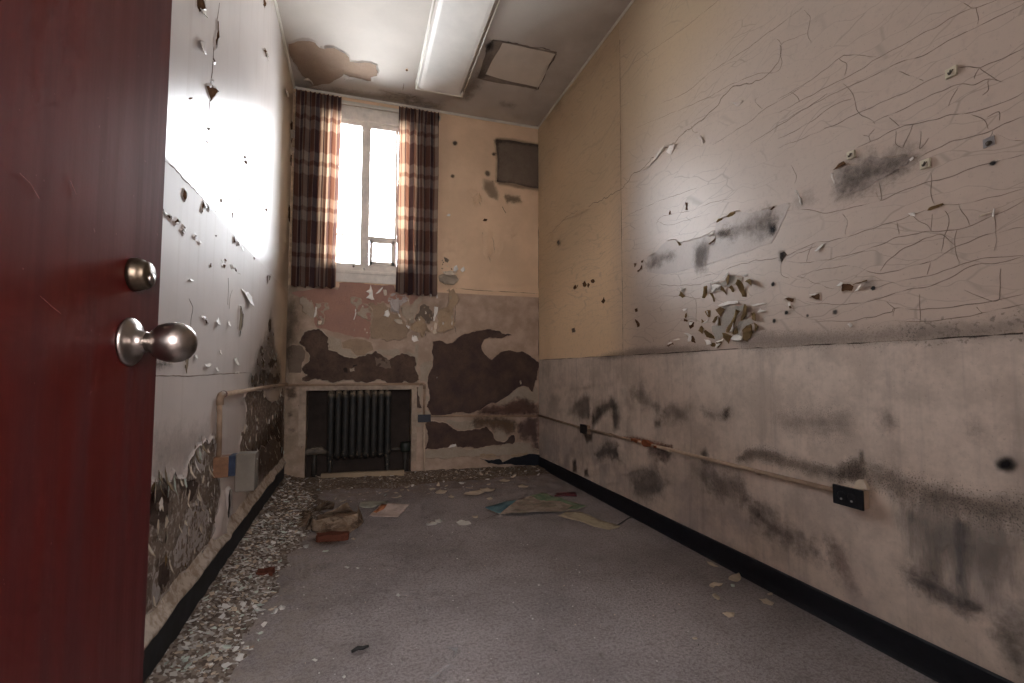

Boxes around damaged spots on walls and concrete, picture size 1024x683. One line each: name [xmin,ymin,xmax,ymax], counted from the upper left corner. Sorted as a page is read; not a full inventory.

peeling [195,0,220,65]
peeling [204,78,219,102]
peeling [286,38,380,87]
crack [454,0,1024,360]
peeling [163,209,201,246]
peeling [200,289,254,337]
peeling [667,272,766,348]
spalling [238,257,540,500]
leakage [585,398,618,443]
leakage [738,446,1024,532]
spalling [145,433,232,618]